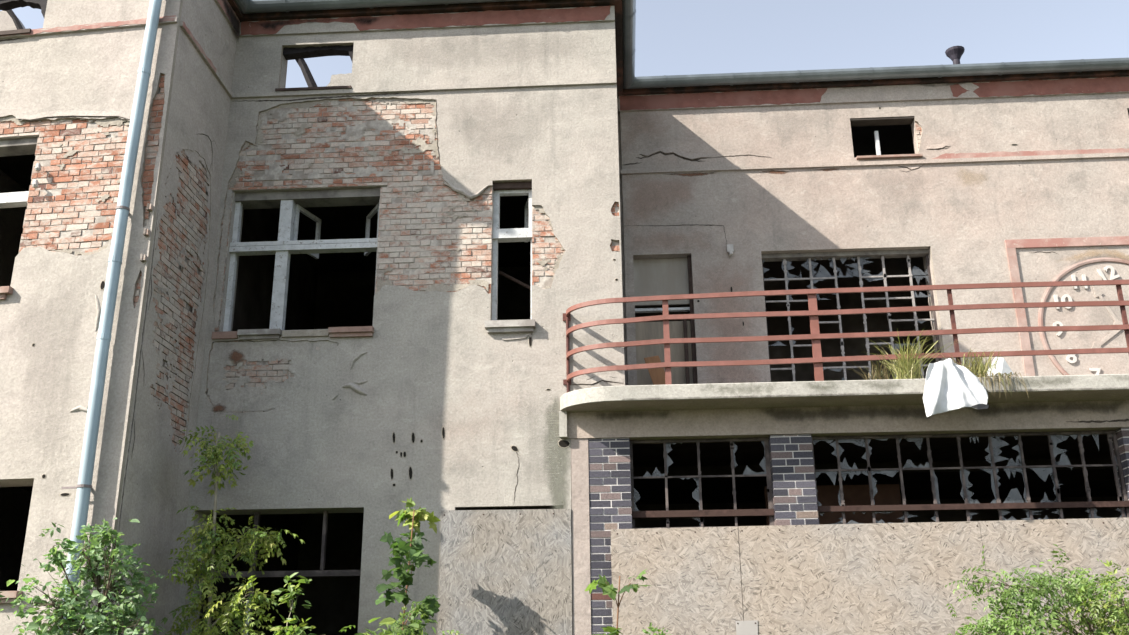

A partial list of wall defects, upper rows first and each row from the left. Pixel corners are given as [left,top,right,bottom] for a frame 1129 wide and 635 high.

peeling [619,88,827,110]
peeling [947,76,1129,97]
flaking render [0,116,130,256]
crack [624,146,771,165]
flaking render [134,74,509,454]
flaking render [532,206,565,289]